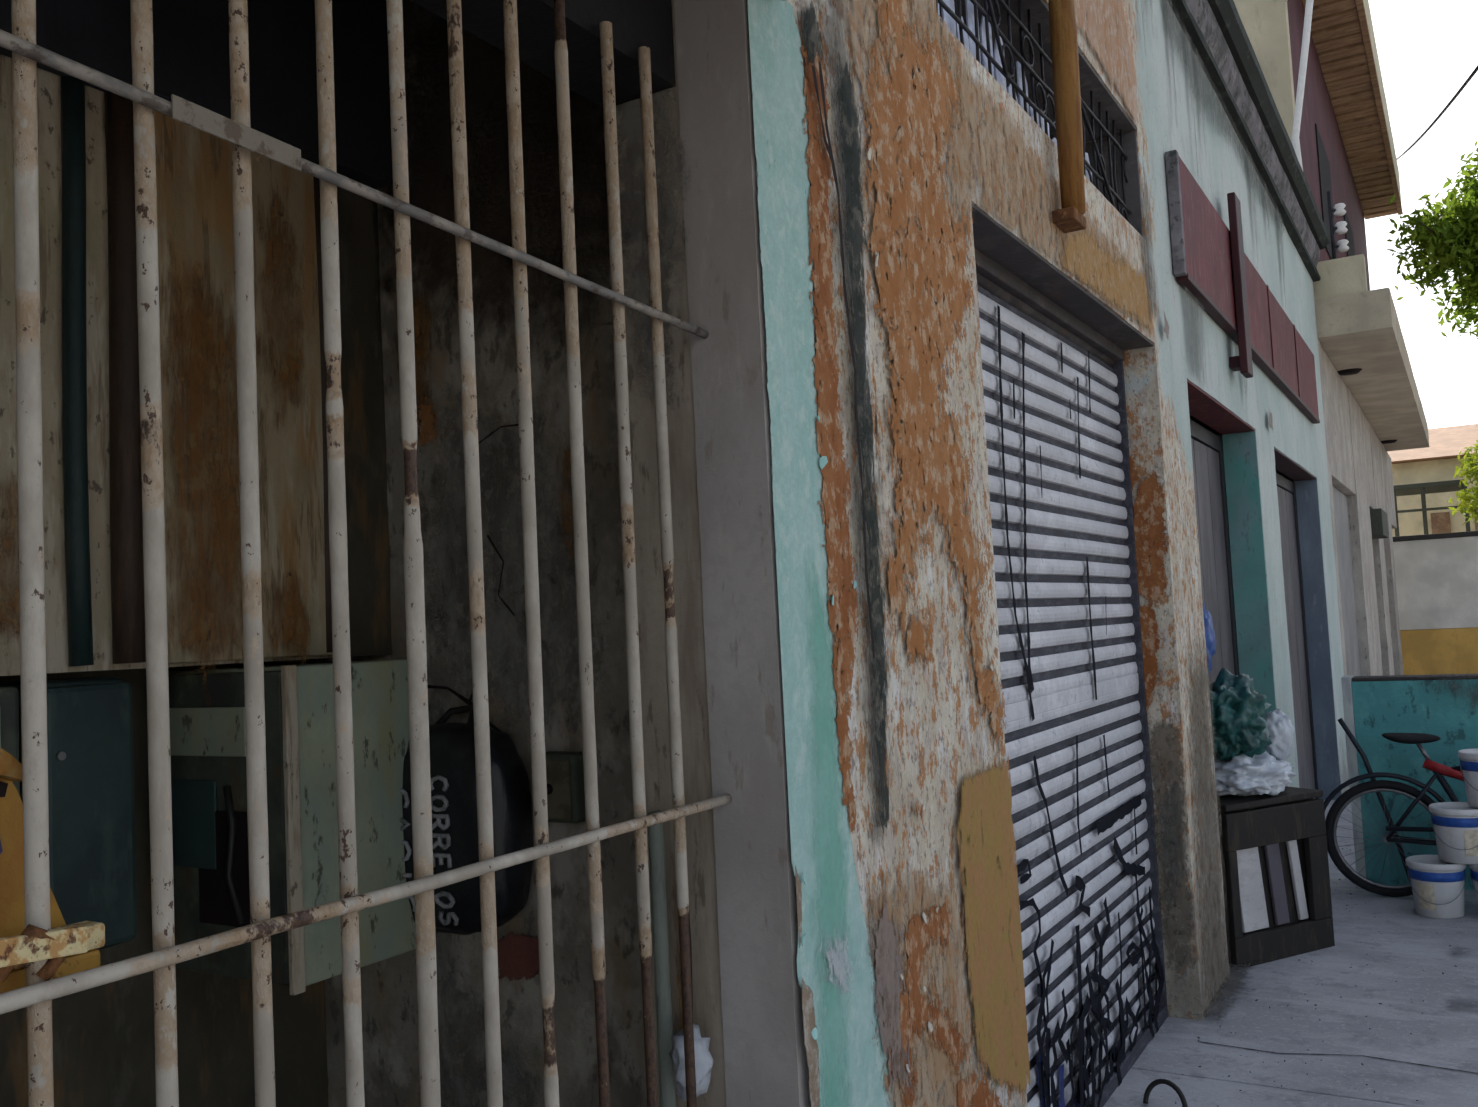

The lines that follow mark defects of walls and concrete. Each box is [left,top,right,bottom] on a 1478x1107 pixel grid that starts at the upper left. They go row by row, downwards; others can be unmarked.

peeling [801,46,860,833]
peeling [845,0,1144,756]
peeling [1129,455,1169,718]
peeling [801,979,820,1107]
peeling [795,866,852,993]
peeling [868,863,1002,1107]
water stain [1148,638,1231,1010]